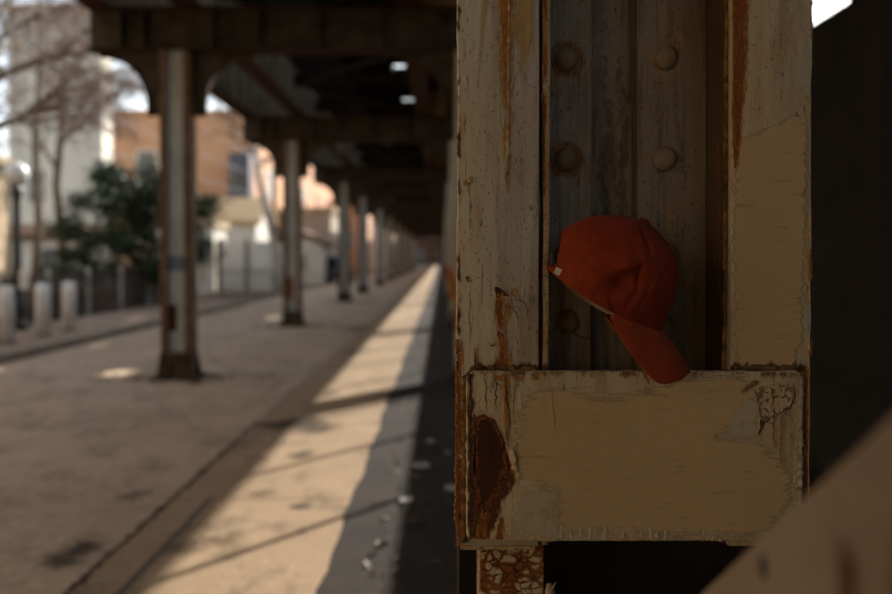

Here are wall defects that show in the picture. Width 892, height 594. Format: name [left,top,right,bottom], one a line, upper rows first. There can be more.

corrosion [497,0,516,191]
corrosion [732,0,749,169]
crack [464,264,517,436]
corrosion [445,256,548,547]
corrosion [730,361,810,498]
crack [744,381,797,423]